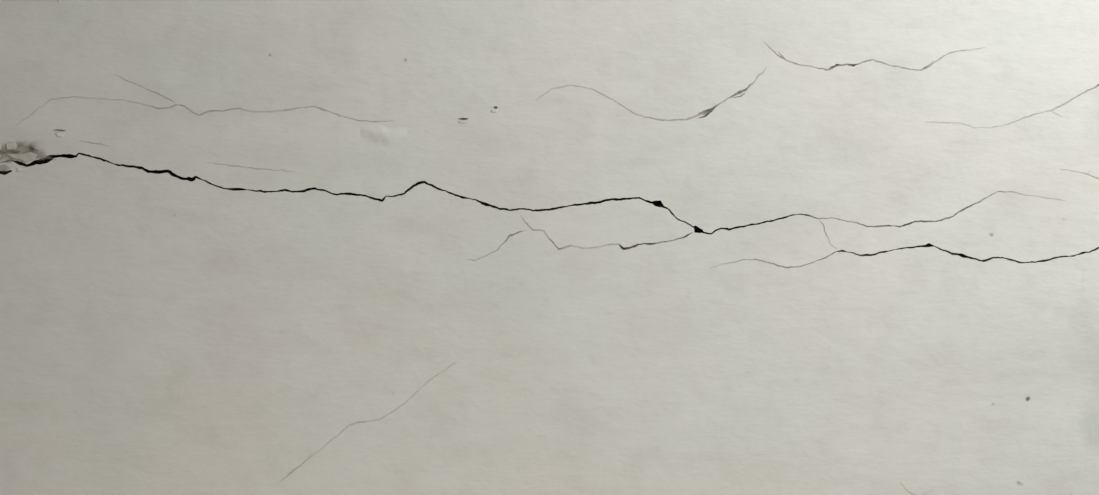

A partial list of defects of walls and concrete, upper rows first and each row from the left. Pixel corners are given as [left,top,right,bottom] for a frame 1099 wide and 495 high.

crack [537,42,984,121]
crack [928,84,1099,129]
crack [0,141,1099,268]
crack [276,361,457,485]